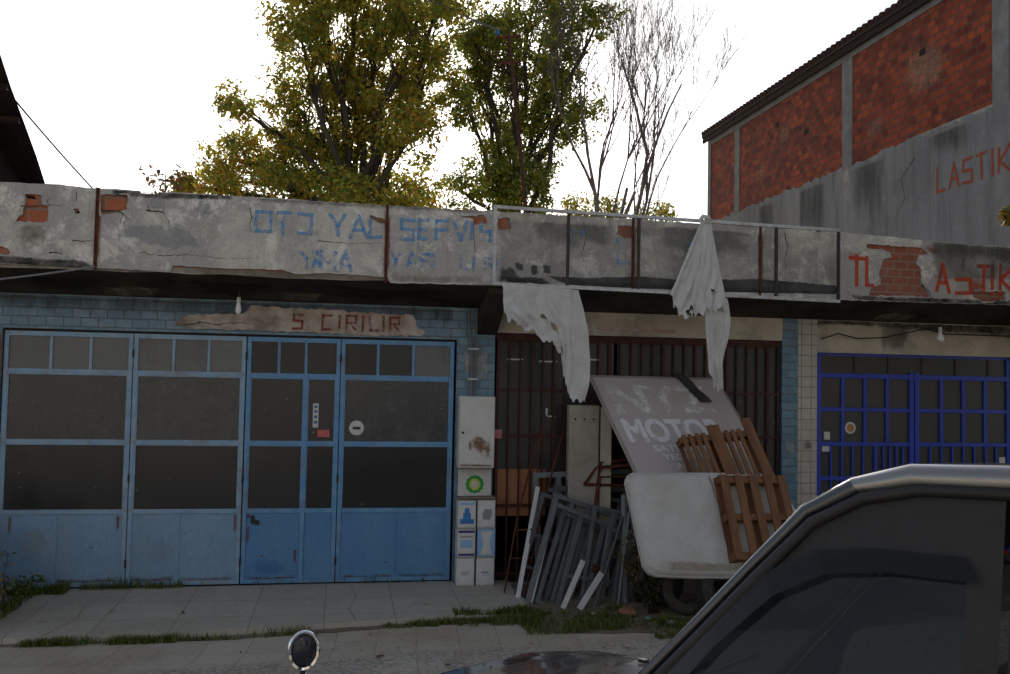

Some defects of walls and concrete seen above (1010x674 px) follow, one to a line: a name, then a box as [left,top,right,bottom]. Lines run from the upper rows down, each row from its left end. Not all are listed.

spalling [13,190,48,226]
spalling [99,193,133,217]
crack [118,201,170,228]
leakage [665,228,697,251]
leakage [713,231,742,252]
crack [140,250,253,259]
spalling [863,241,931,300]